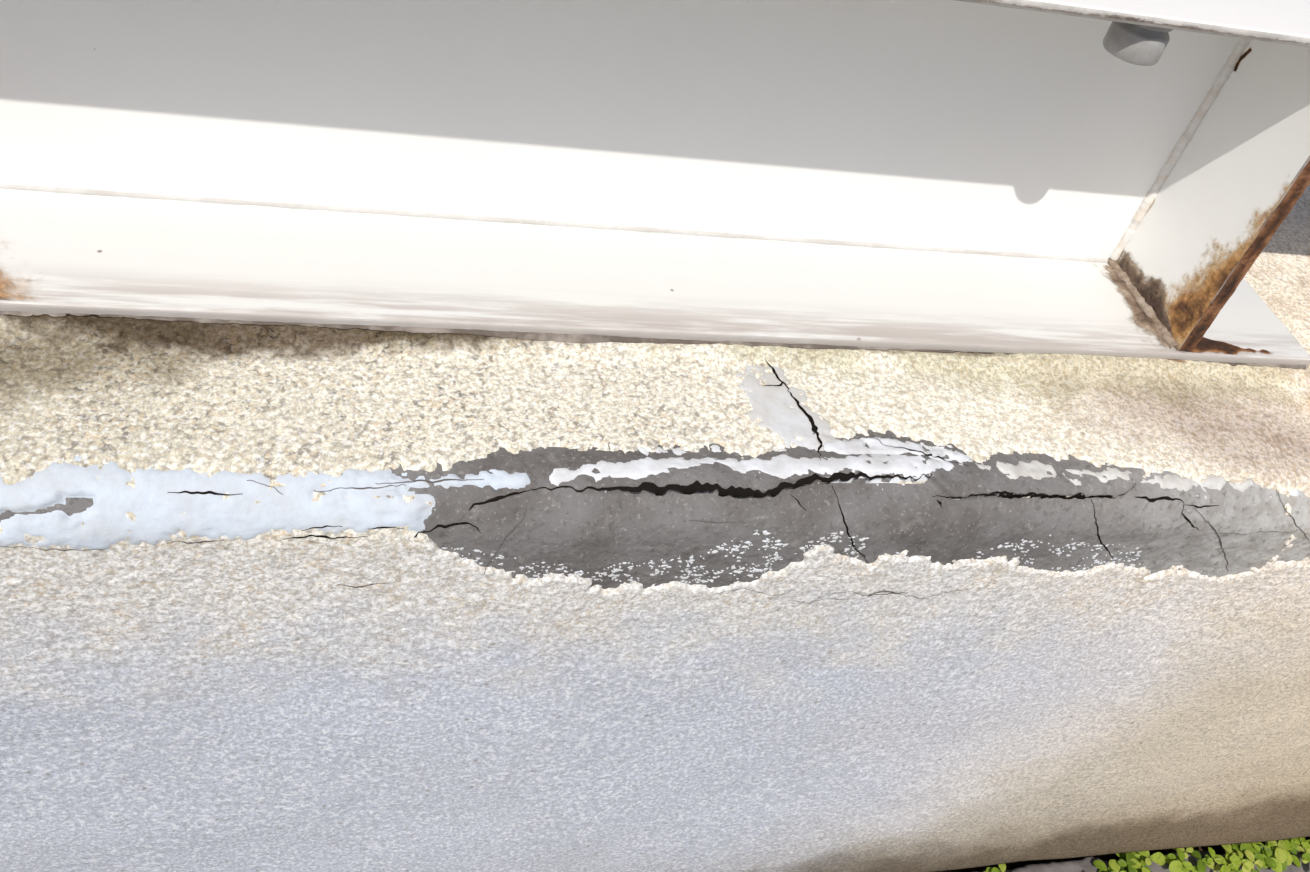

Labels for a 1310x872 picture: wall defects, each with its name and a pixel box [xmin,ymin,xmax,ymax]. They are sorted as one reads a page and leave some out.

corrosion [0,270,24,299]
corrosion [1105,161,1310,354]
crack [167,480,283,495]
spalling [0,366,1310,589]
crack [283,359,1309,604]